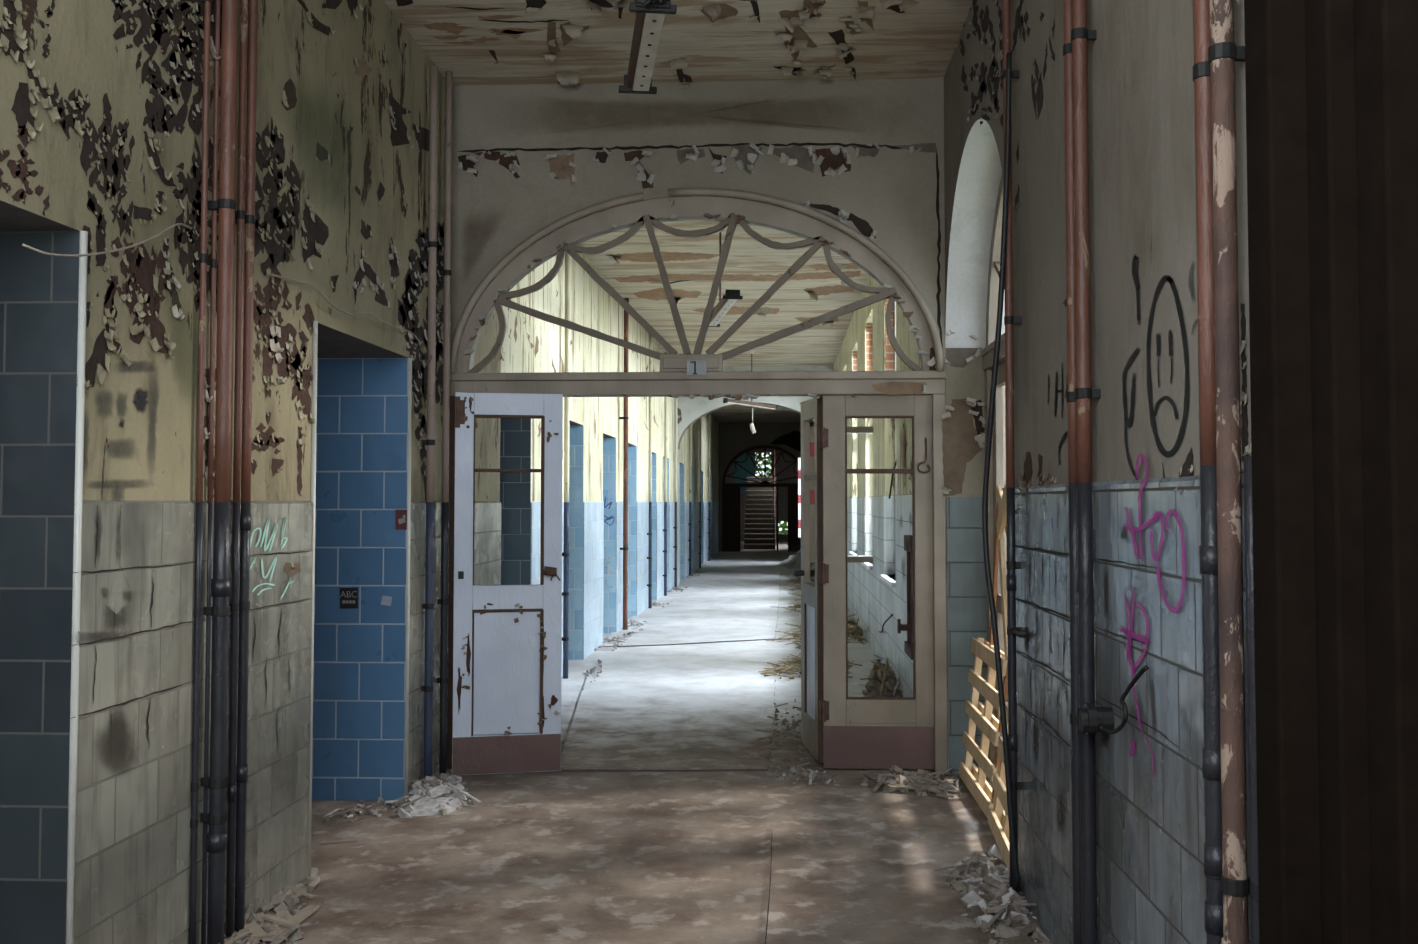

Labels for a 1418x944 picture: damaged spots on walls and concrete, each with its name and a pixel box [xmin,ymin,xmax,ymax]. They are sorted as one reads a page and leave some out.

peeling [297,0,364,36]
peeling [423,0,636,86]
peeling [773,0,920,80]
peeling [956,0,1055,164]
peeling [389,93,430,152]
peeling [0,0,222,391]
peeling [457,151,521,179]
peeling [251,79,329,496]
peeling [331,219,444,501]
peeling [457,634,471,713]
peeling [514,603,548,678]
peeling [537,695,559,727]